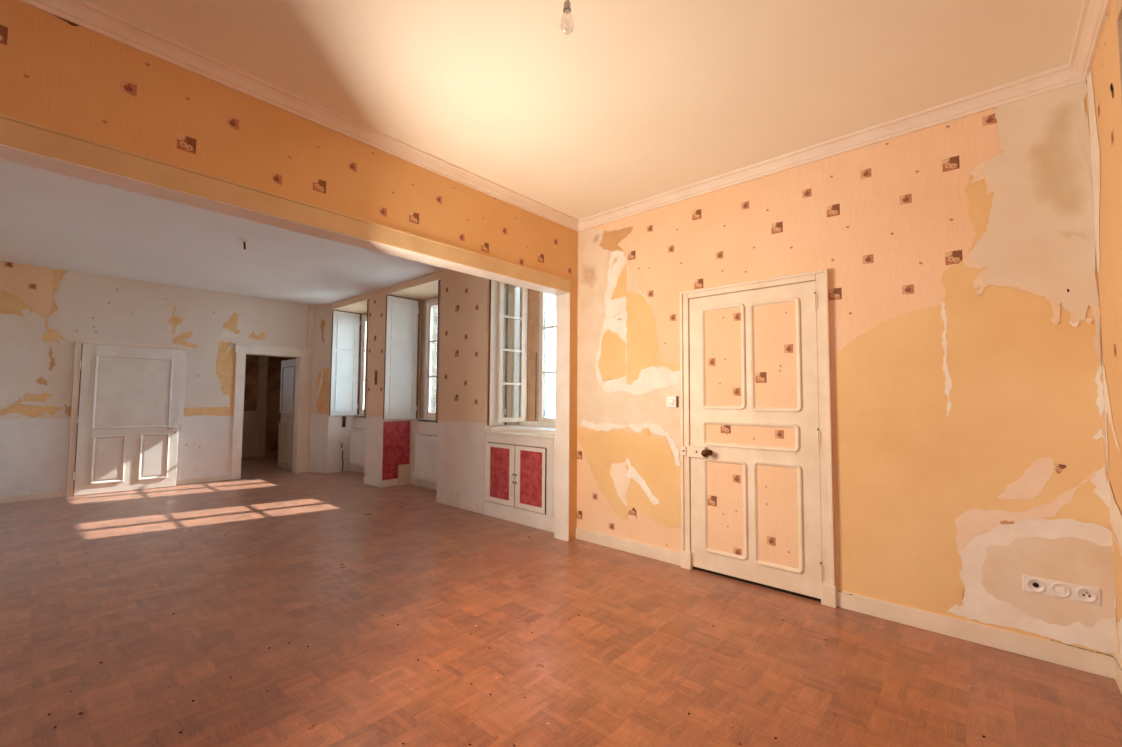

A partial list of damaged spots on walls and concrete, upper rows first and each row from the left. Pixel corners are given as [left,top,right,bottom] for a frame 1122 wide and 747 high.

flaking render [963,80,1101,364]
leakage [1021,97,1093,244]
peeling [16,347,71,416]
peeling [223,312,241,334]
flaking render [577,228,681,464]
flaking render [948,480,1122,659]